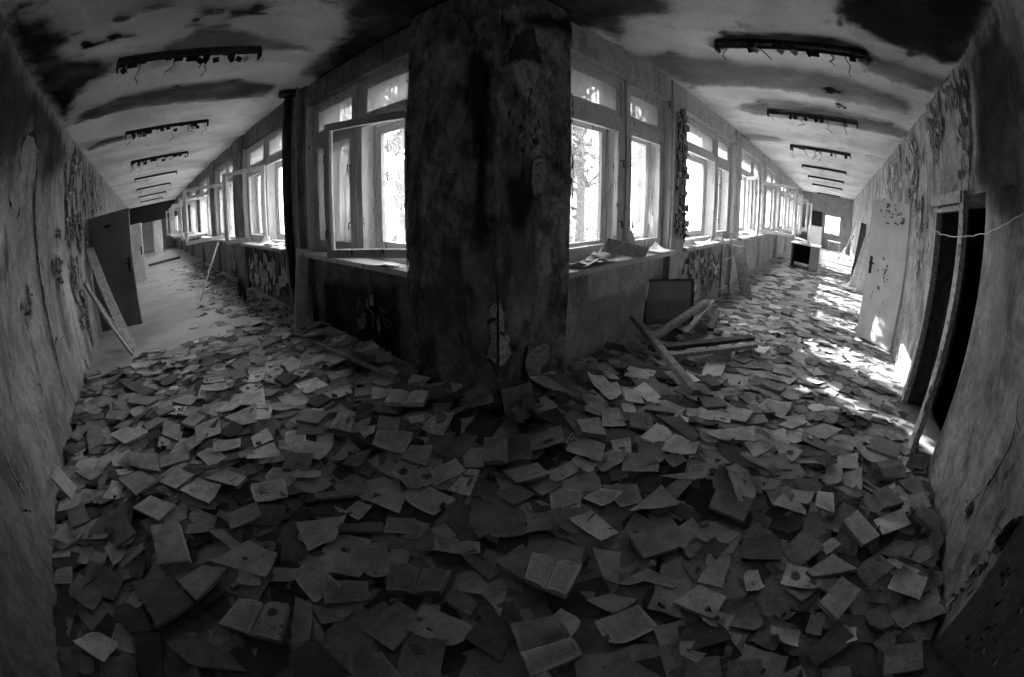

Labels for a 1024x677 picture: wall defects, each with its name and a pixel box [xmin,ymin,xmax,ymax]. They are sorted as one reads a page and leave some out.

peeling [51,140,113,347]
damp [0,3,274,179]
peeling [230,248,291,301]
flaking render [485,293,551,380]
peeling [674,108,725,296]
damp [648,0,1023,218]
peeling [880,65,972,281]